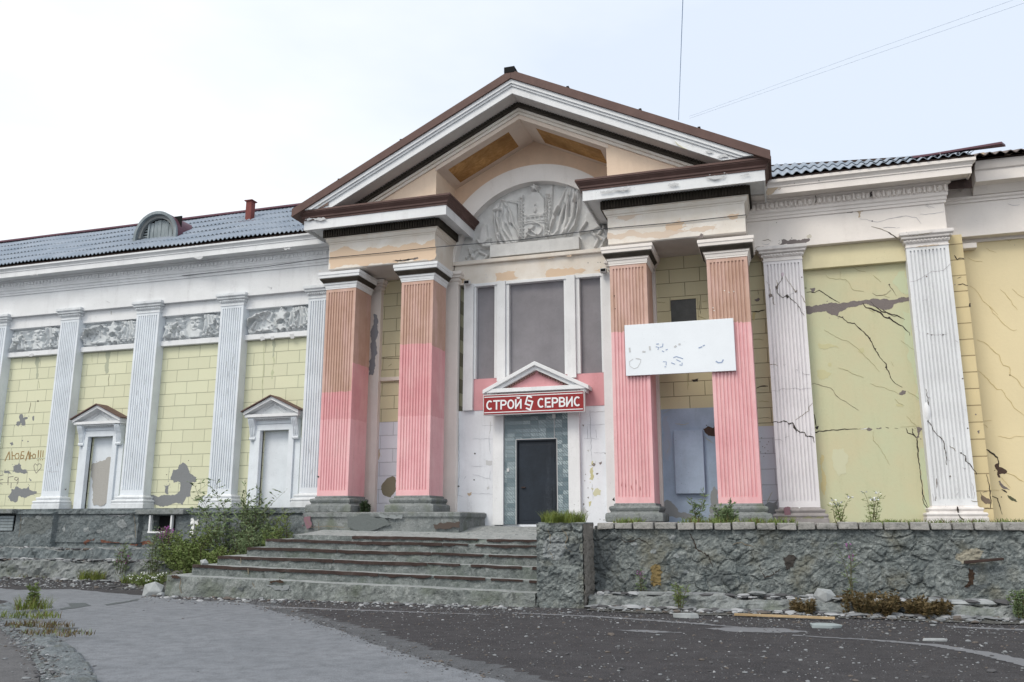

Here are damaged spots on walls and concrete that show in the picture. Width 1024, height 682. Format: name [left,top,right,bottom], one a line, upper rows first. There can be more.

spalling [778,235,812,245]
crack [751,240,1024,513]
peeling [4,463,37,502]
peeling [151,460,196,507]